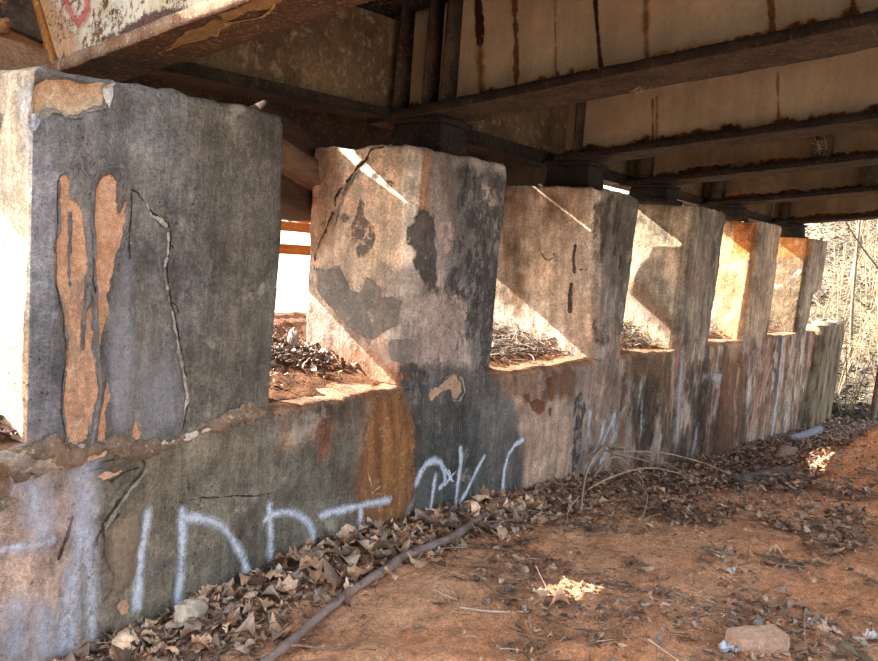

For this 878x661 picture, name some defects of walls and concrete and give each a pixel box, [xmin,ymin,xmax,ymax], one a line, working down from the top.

spalling [27,79,116,131]
corrosion [474,0,485,93]
corrosion [593,0,603,68]
crack [313,146,384,275]
spalling [0,149,266,512]
crack [128,189,189,428]
corrosion [355,388,416,530]
flaking render [429,373,465,401]
water stain [398,164,506,400]
water stain [524,371,616,476]
water stain [675,351,721,457]
crack [57,459,149,601]